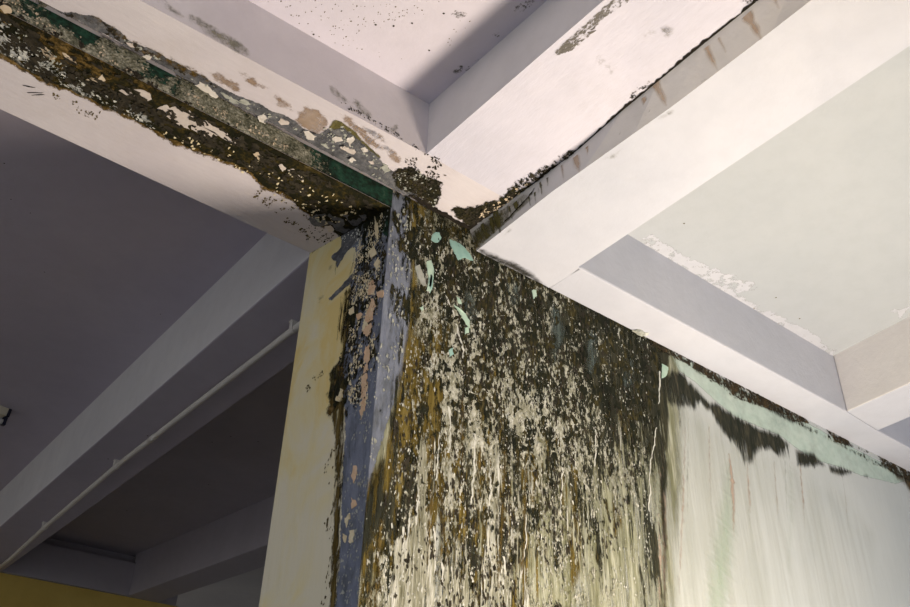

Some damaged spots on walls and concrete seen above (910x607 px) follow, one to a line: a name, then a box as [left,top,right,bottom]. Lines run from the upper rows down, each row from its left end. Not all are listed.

damp [337,92,401,147]
corrosion [471,177,548,248]
damp [0,0,391,607]
peeling [57,10,422,607]
damp [358,157,808,607]
damp [797,452,851,476]
damp [827,430,910,482]